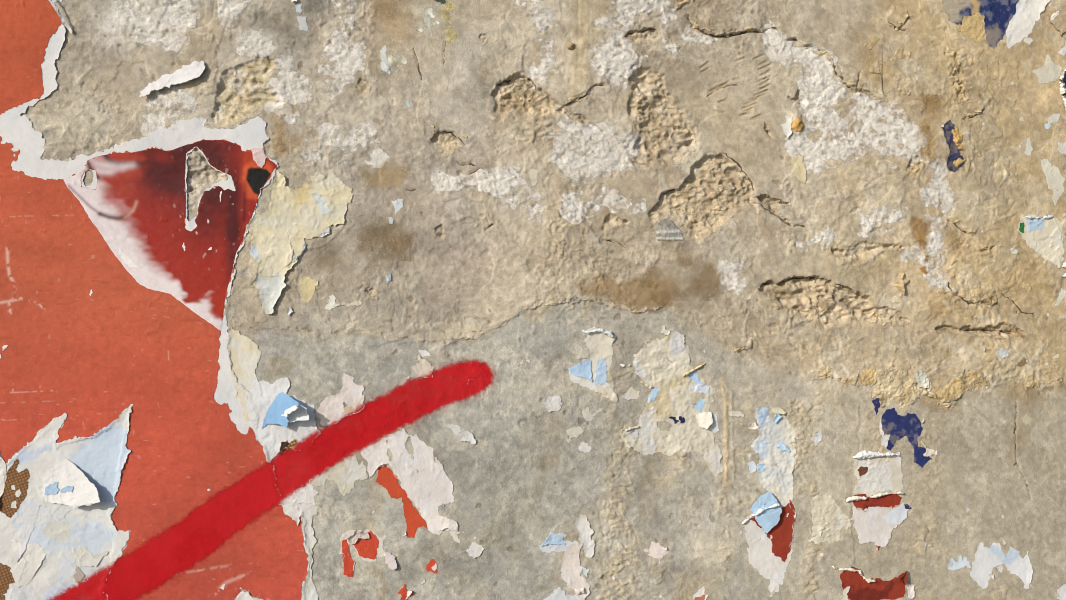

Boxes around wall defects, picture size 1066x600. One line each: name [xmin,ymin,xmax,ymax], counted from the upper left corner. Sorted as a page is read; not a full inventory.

spalling [489,0,1000,308]
spalling [758,275,912,331]
crack [944,281,1033,334]